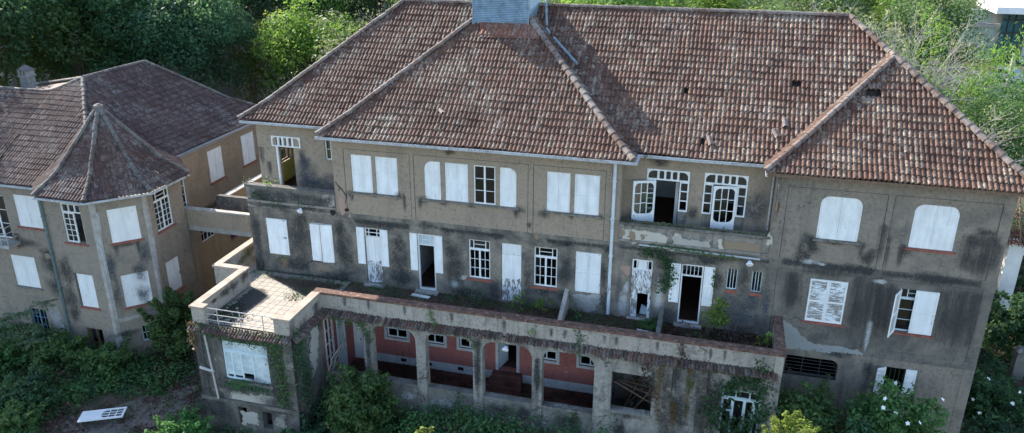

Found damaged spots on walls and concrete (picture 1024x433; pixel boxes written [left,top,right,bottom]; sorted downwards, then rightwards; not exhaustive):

damp [44,251,78,331]
damp [96,213,160,303]
damp [212,151,503,303]
damp [524,260,570,299]
peeling [620,229,773,253]
damp [782,225,1001,349]
peeling [783,320,863,356]
peeling [230,391,287,429]